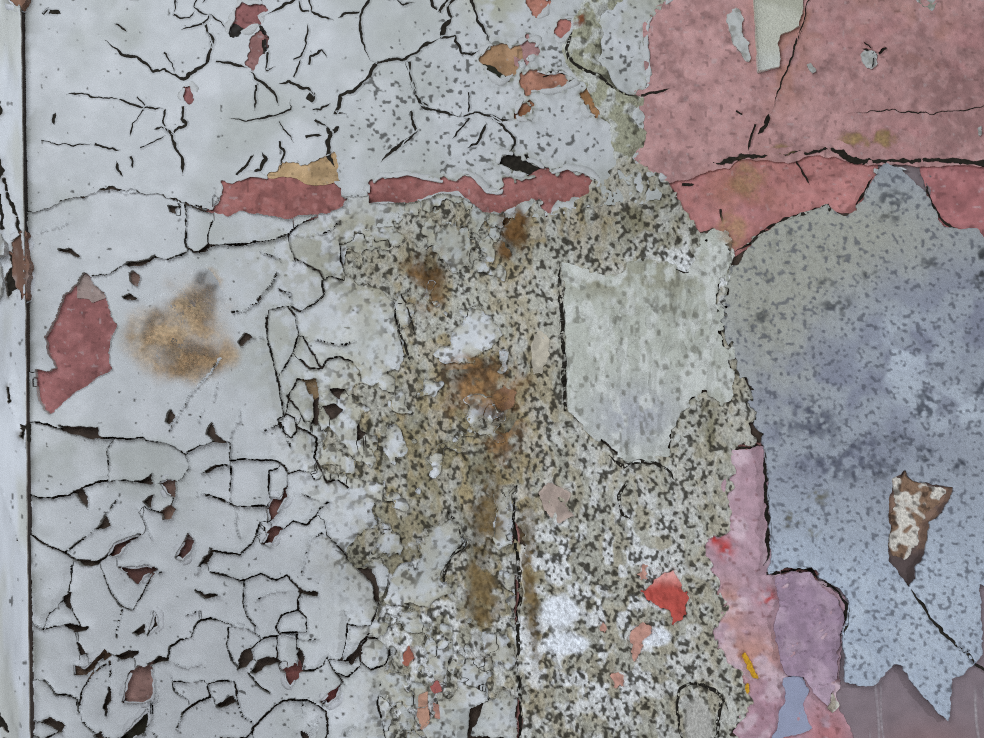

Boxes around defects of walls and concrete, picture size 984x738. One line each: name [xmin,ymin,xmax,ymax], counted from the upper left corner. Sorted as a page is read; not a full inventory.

peeling [5,0,31,13]
crack [41,91,190,177]
crack [104,0,518,176]
crack [542,19,670,99]
peeling [634,0,984,257]
crack [713,0,984,254]
damp [128,291,236,378]
crack [555,262,569,411]
peeling [0,149,602,738]
crack [509,487,525,738]
peeling [637,564,689,625]
peeling [705,446,984,738]